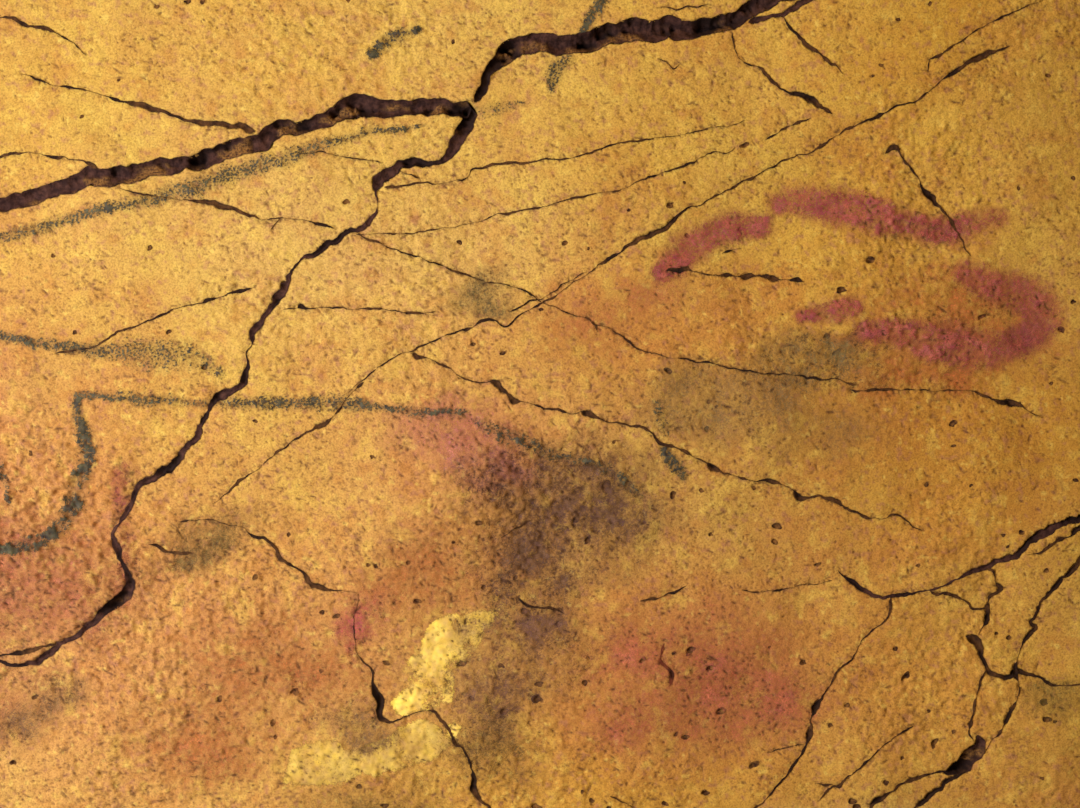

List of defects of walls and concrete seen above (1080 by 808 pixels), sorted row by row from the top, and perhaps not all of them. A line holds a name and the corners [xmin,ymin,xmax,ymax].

crack [0,0,1042,667]
crack [148,519,491,808]
crack [659,644,674,685]
crack [744,515,1080,808]